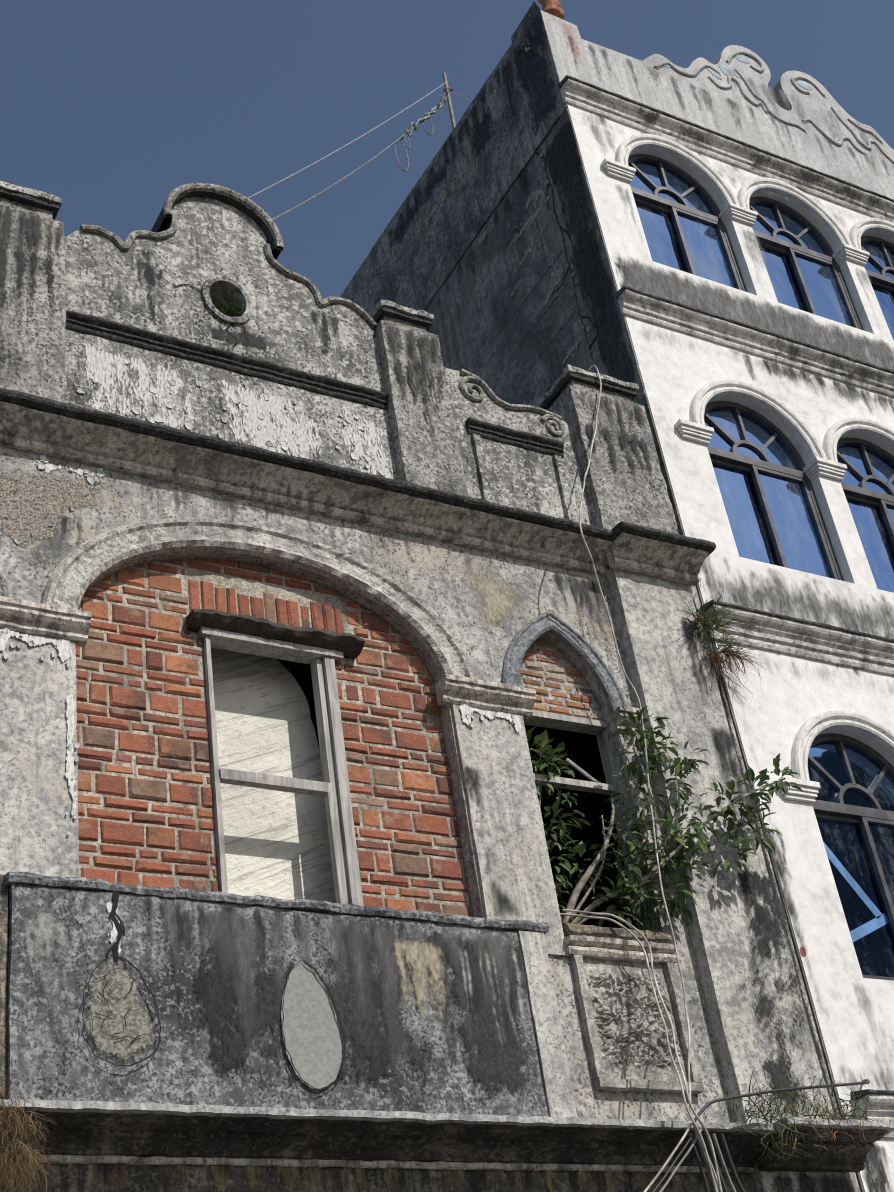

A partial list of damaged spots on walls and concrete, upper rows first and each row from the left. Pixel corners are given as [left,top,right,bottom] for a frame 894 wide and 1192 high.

damp [388,17,556,246]
damp [151,183,284,260]
crack [425,116,616,384]
damp [546,121,894,410]
flaking render [0,455,105,548]
peeling [74,343,202,431]
peeling [218,379,393,479]
damp [310,310,338,356]
damp [580,391,659,505]
damp [106,902,121,964]
crack [82,891,161,1066]
damp [147,898,531,1098]